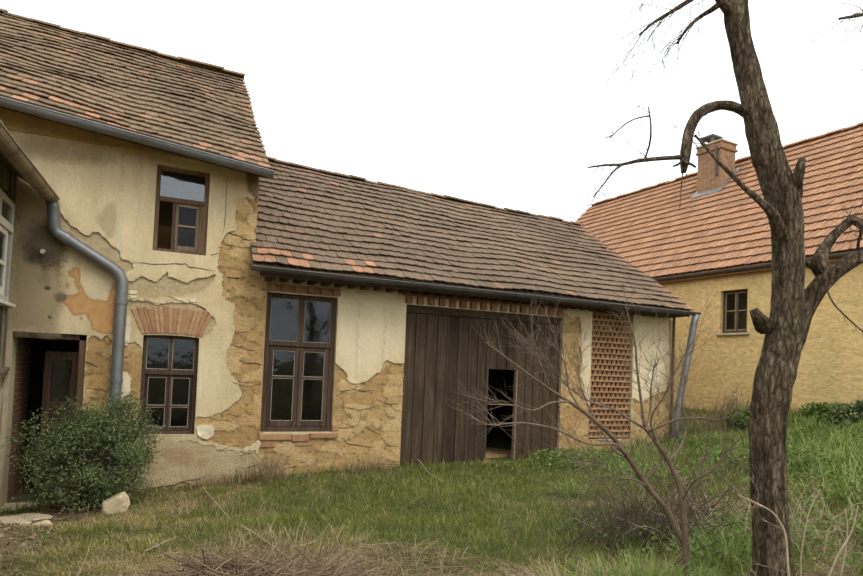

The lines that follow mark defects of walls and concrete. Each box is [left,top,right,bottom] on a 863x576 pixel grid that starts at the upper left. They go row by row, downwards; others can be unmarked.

spalling [60,196,404,493]
spalling [559,313,669,452]